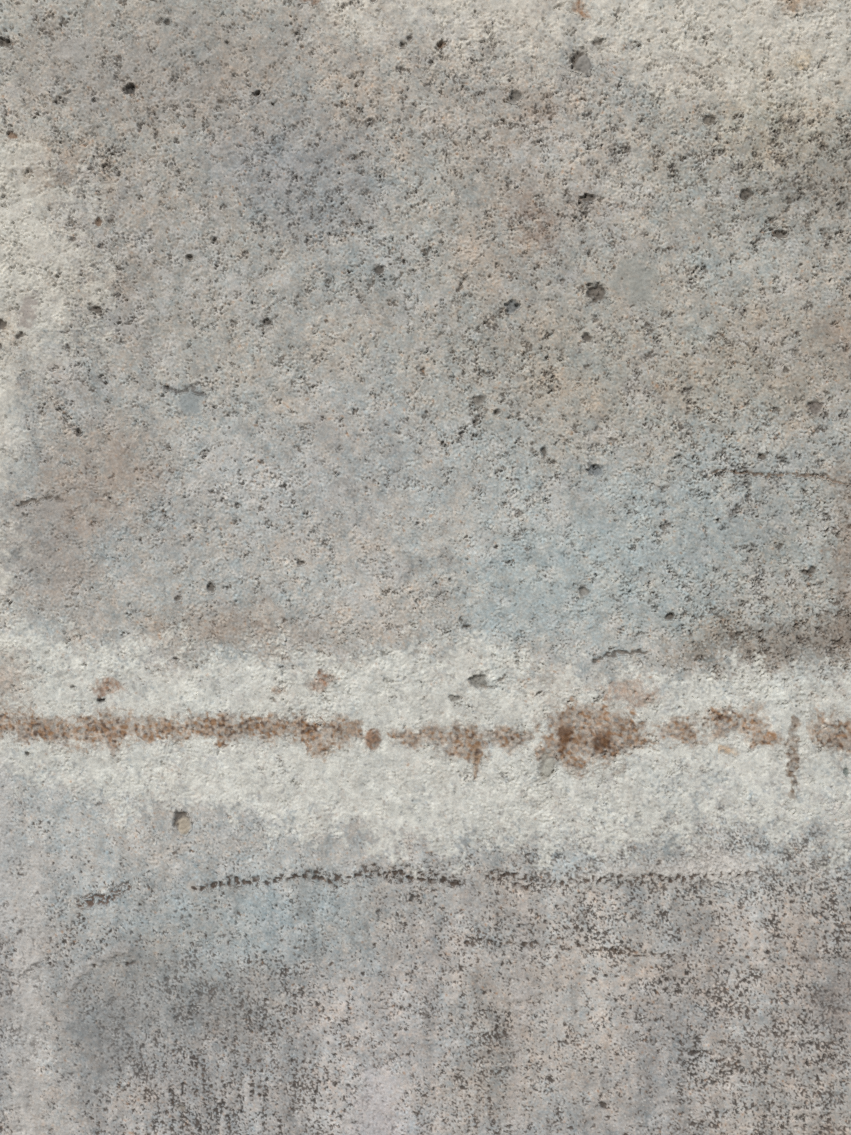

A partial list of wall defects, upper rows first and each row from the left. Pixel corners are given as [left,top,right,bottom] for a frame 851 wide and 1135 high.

rust [0,643,851,801]
crack [190,862,759,894]
crack [74,882,131,911]